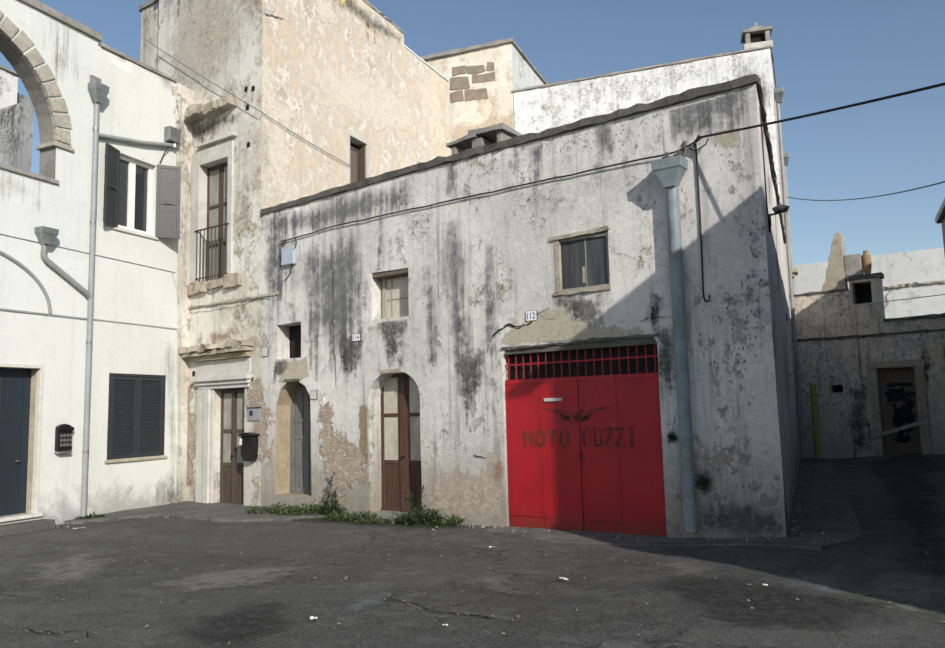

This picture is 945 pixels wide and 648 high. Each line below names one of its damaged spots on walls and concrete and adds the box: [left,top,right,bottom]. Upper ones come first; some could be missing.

water stain [339,0,395,40]
peeling [262,61,299,205]
water stain [305,236,362,371]
water stain [448,226,483,416]
crack [487,307,557,354]
flaking render [502,305,644,346]
water stain [558,294,603,327]
flaking render [280,358,308,382]
flaking render [246,377,272,464]
flaking render [312,398,369,510]
flaking render [431,445,503,518]